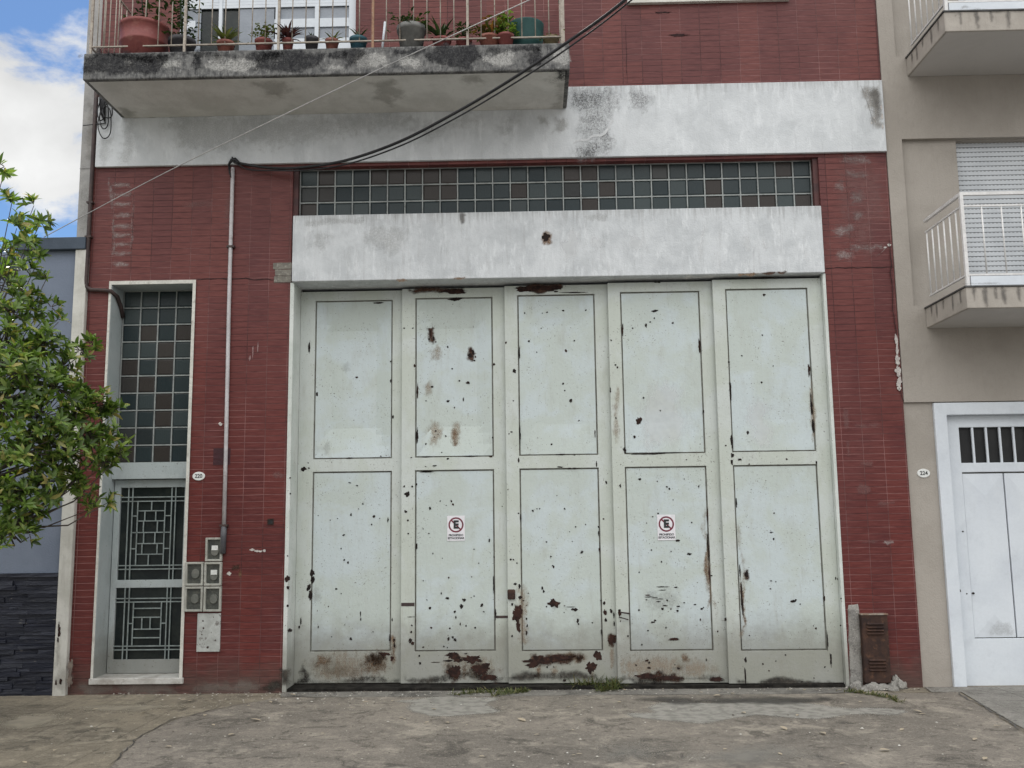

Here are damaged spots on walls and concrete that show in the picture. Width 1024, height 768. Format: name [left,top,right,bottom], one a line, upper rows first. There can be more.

water stain [83,50,176,74]
water stain [192,48,364,72]
water stain [864,89,880,126]
corrosion [397,277,466,294]
corrosion [515,284,563,294]
corrosion [512,590,527,640]
corrosion [316,636,395,679]
corrosion [445,652,497,683]
corrosion [523,634,616,677]
corrosion [635,671,684,682]